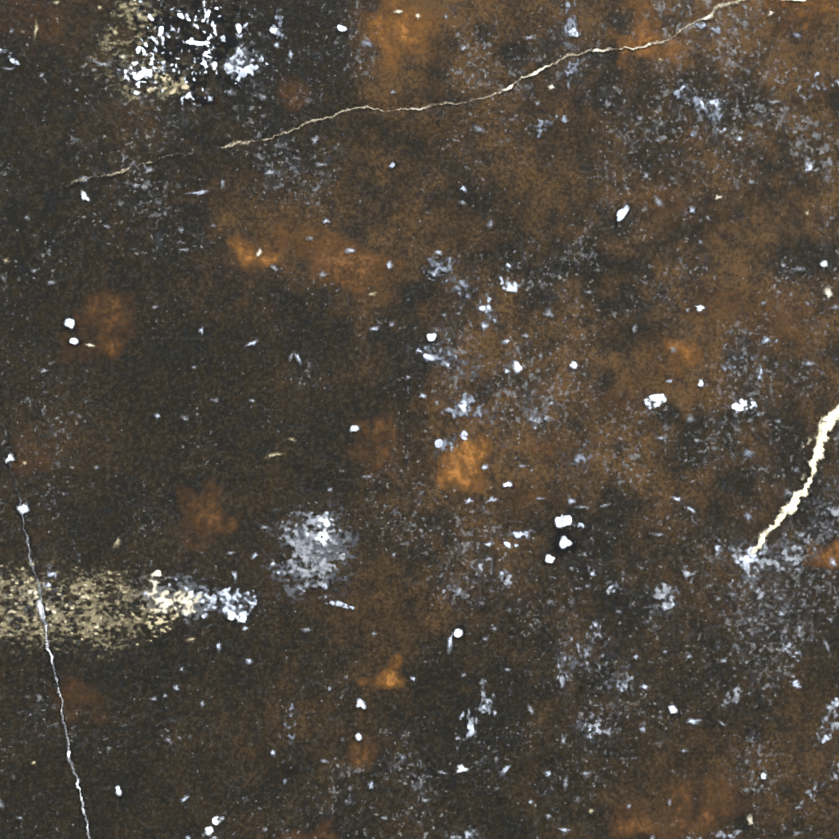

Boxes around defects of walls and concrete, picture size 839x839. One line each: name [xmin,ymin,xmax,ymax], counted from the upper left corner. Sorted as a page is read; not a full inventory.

spalling [98,0,268,105]
crack [221,0,744,148]
crack [71,155,186,184]
corrosion [439,437,486,488]
crack [750,404,839,555]
crack [19,498,90,839]